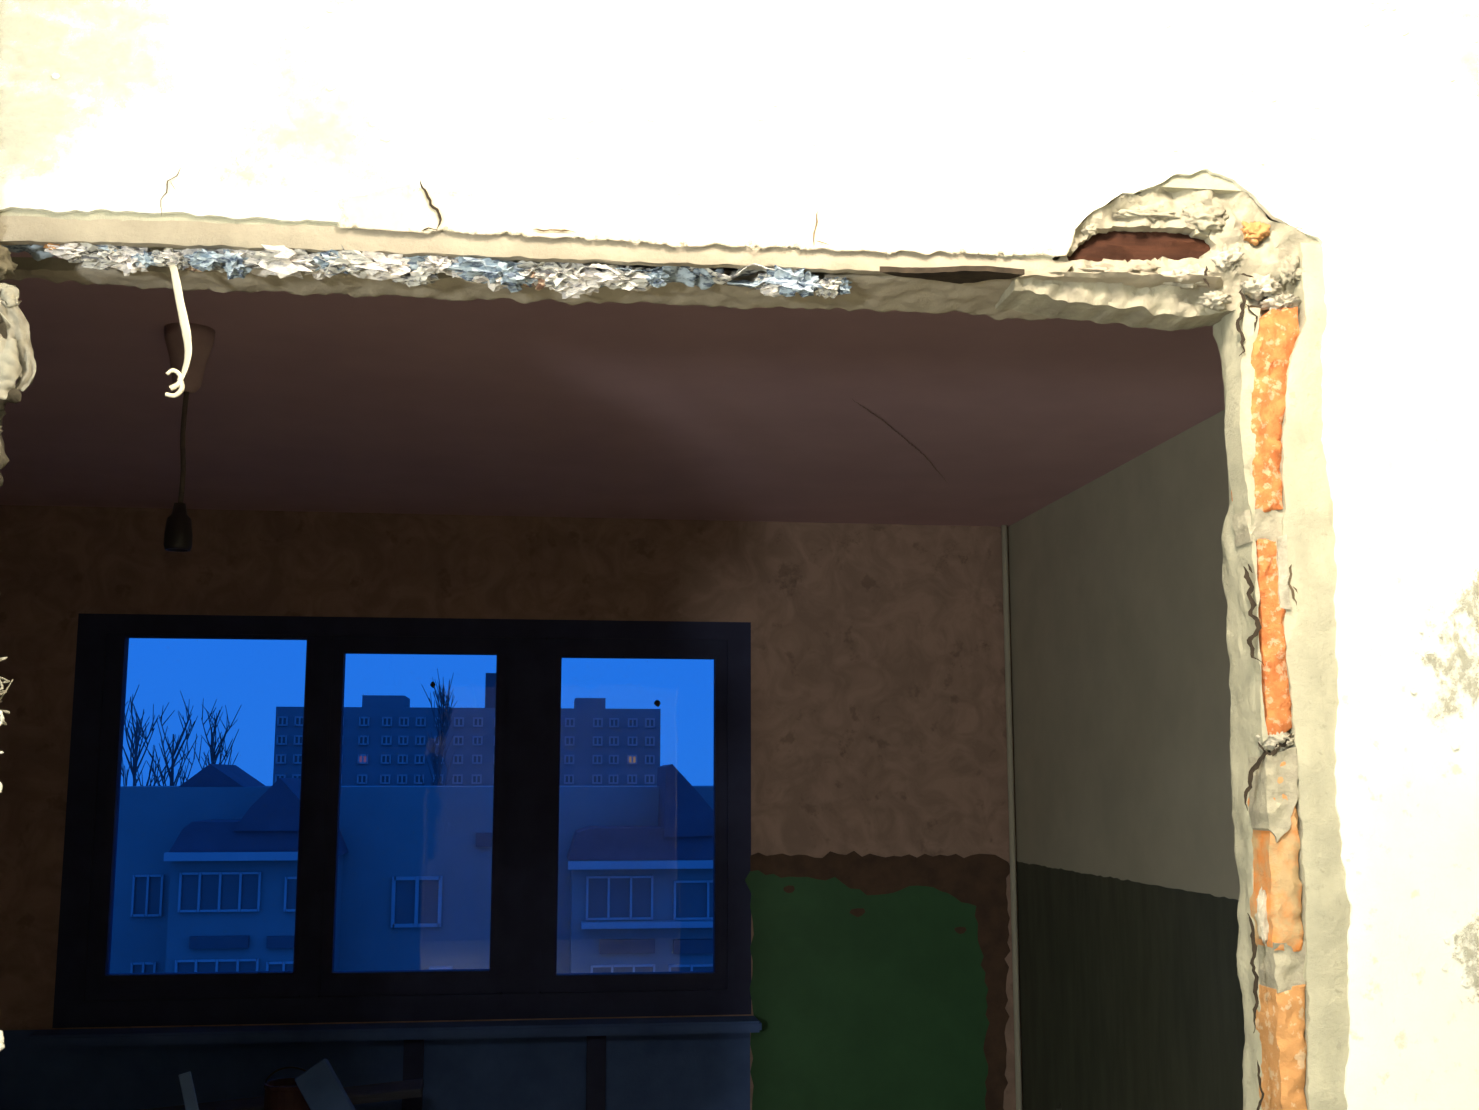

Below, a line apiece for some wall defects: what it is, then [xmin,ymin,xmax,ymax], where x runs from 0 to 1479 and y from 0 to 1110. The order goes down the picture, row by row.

crack [420,180,442,231]
flaking render [338,175,1315,1110]
crack [1243,564,1298,665]
peeling [1419,572,1479,718]
crack [1244,733,1292,811]
crack [1247,913,1264,1110]